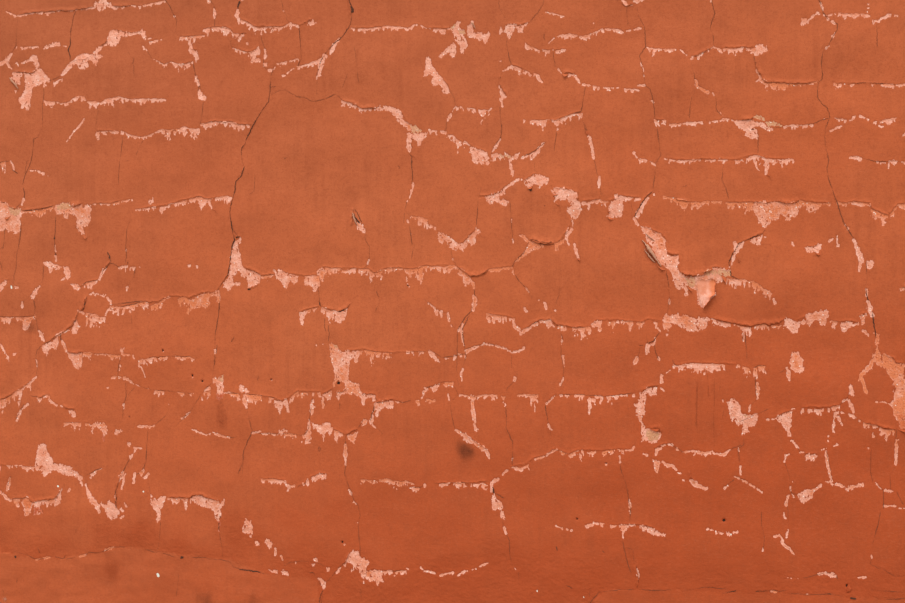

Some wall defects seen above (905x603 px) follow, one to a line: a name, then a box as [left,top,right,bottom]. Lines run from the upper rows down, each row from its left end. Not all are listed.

crack [213,1,359,368]
peeling [0,0,646,441]
crack [633,9,661,226]
peeling [647,44,817,91]
peeling [641,155,905,308]
crack [817,0,875,317]
crack [456,304,473,385]
crack [633,333,660,365]
peeling [0,442,150,520]
peeling [173,297,905,588]
crack [723,476,765,552]
crack [693,555,904,600]